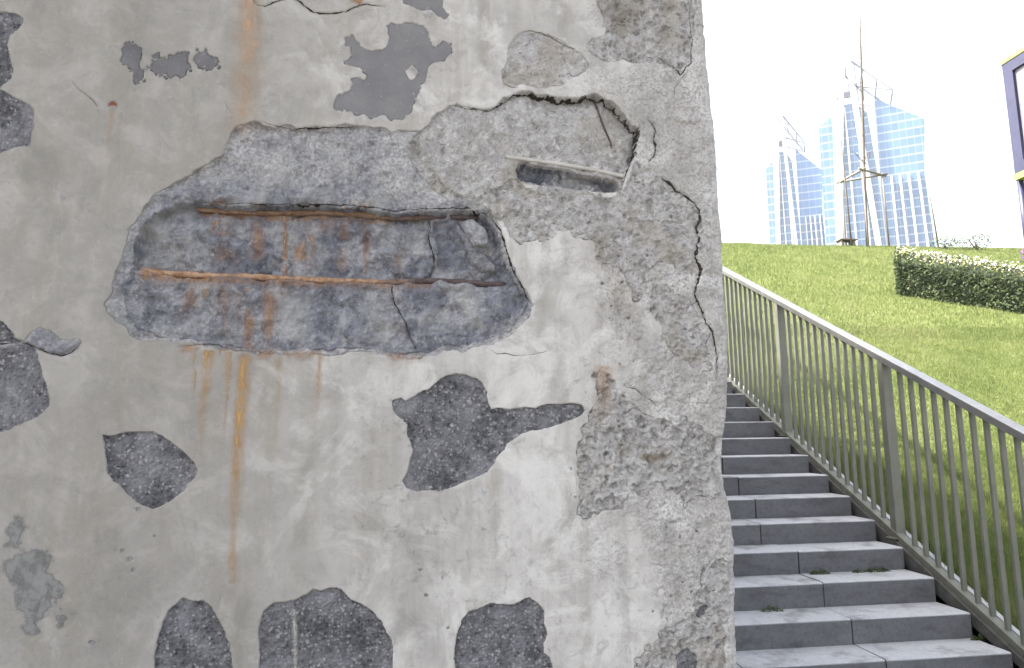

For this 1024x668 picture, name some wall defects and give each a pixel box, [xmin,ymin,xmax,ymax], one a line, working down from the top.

crack [253,0,376,14]
spalling [105,0,712,376]
crack [622,121,718,409]
peeling [0,328,82,356]
corrosion [235,357,246,448]
spalling [570,371,720,519]